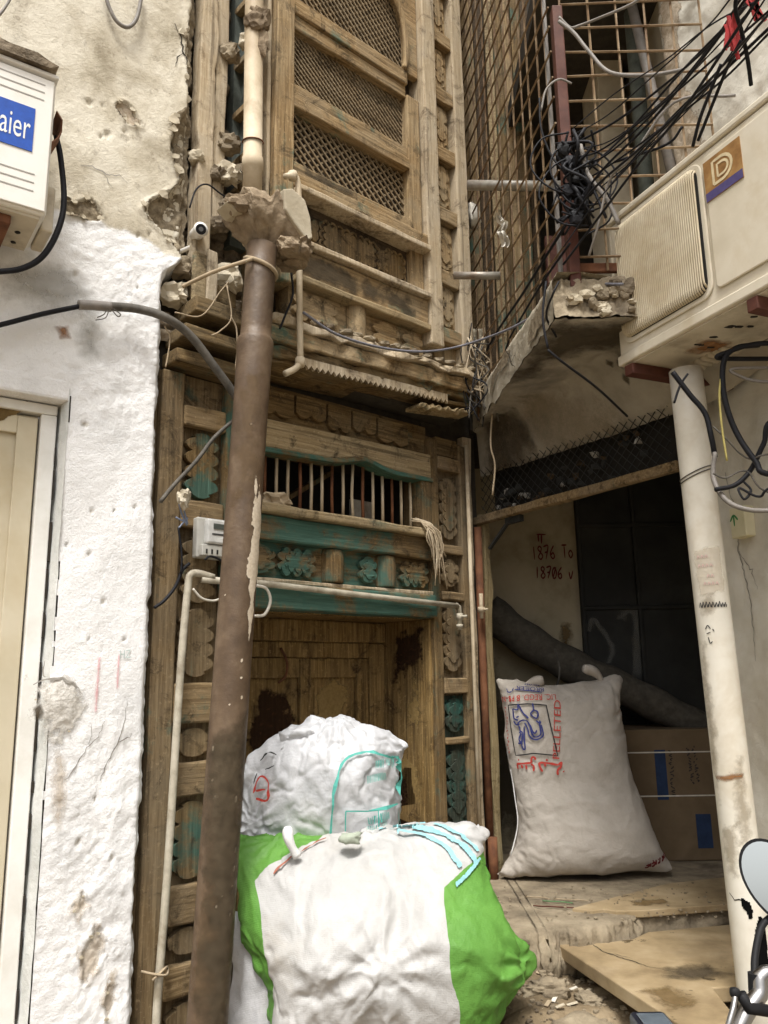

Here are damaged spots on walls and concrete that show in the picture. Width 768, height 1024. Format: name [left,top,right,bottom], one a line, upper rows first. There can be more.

flaking render [116,99,140,126]
flaking render [141,0,196,256]
flaking render [66,195,103,221]
crack [737,539,757,661]